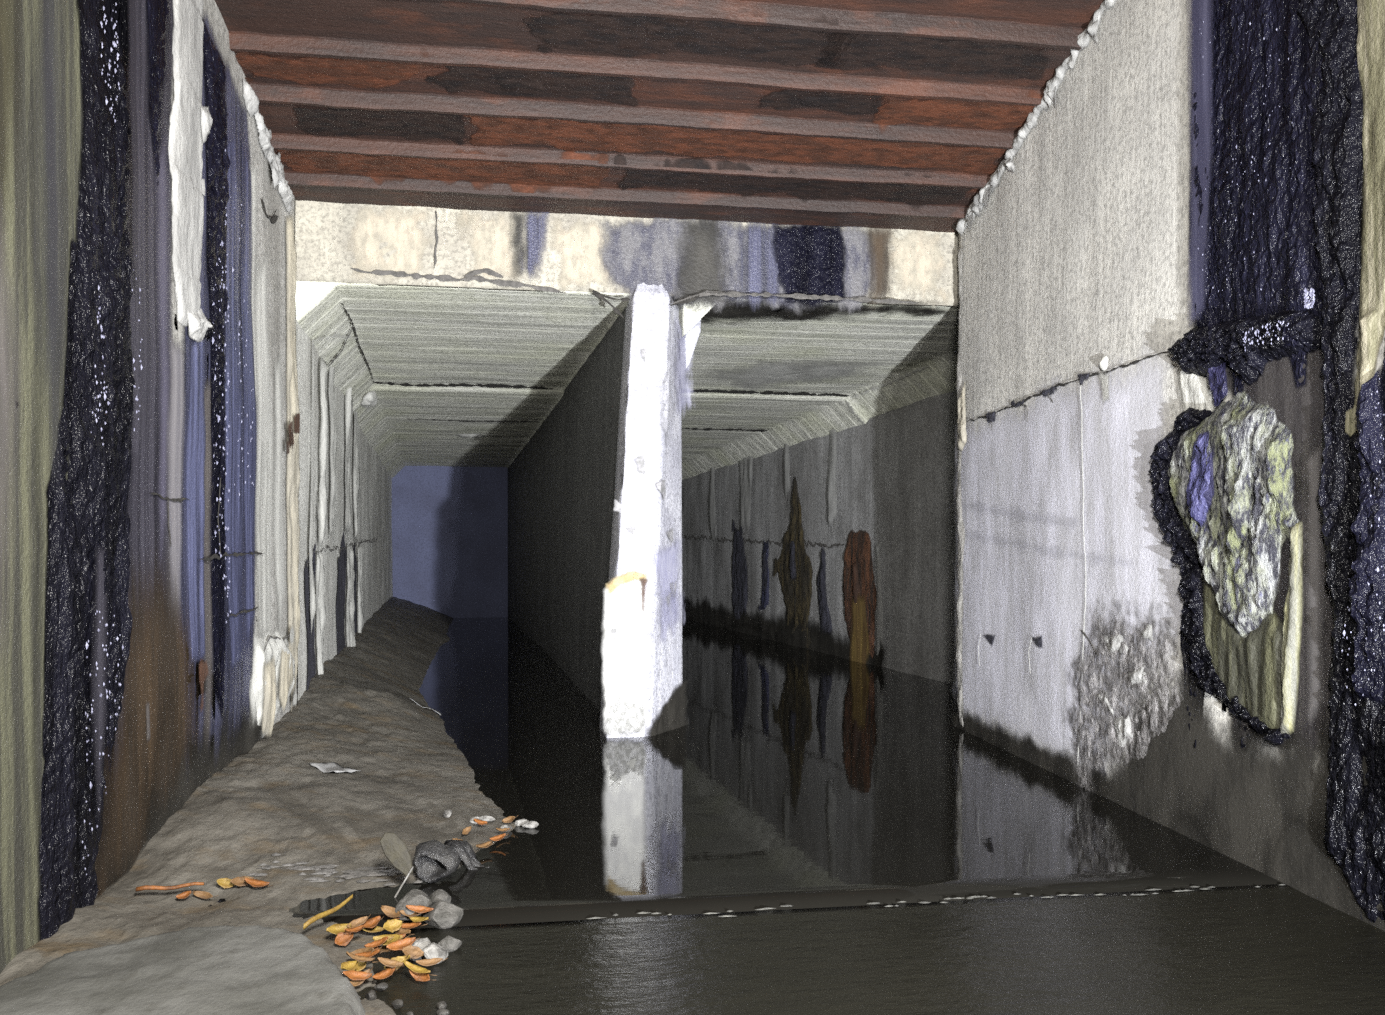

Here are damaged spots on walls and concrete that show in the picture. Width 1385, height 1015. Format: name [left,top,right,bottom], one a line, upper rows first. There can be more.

corrosion [235,52,429,89]
corrosion [277,91,1043,193]
water stain [601,218,942,323]
water stain [34,0,360,941]
corrosion [850,596,869,664]
spalling [1069,605,1184,791]
water stain [951,0,1385,931]
spalling [1168,392,1300,729]